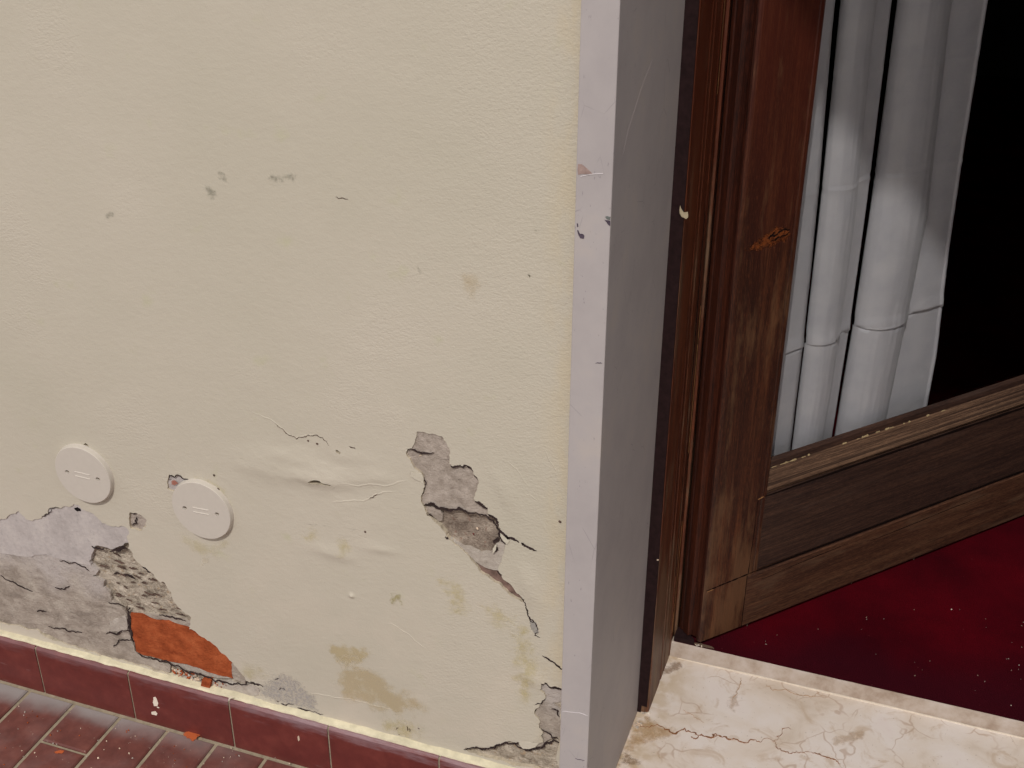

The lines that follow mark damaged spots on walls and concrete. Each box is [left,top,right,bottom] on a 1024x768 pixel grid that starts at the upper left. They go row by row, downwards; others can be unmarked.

spalling [168,475,188,490]
spalling [407,432,510,576]
spalling [0,504,323,715]
spalling [464,683,562,768]
crack [639,710,839,764]
crack [732,680,819,700]